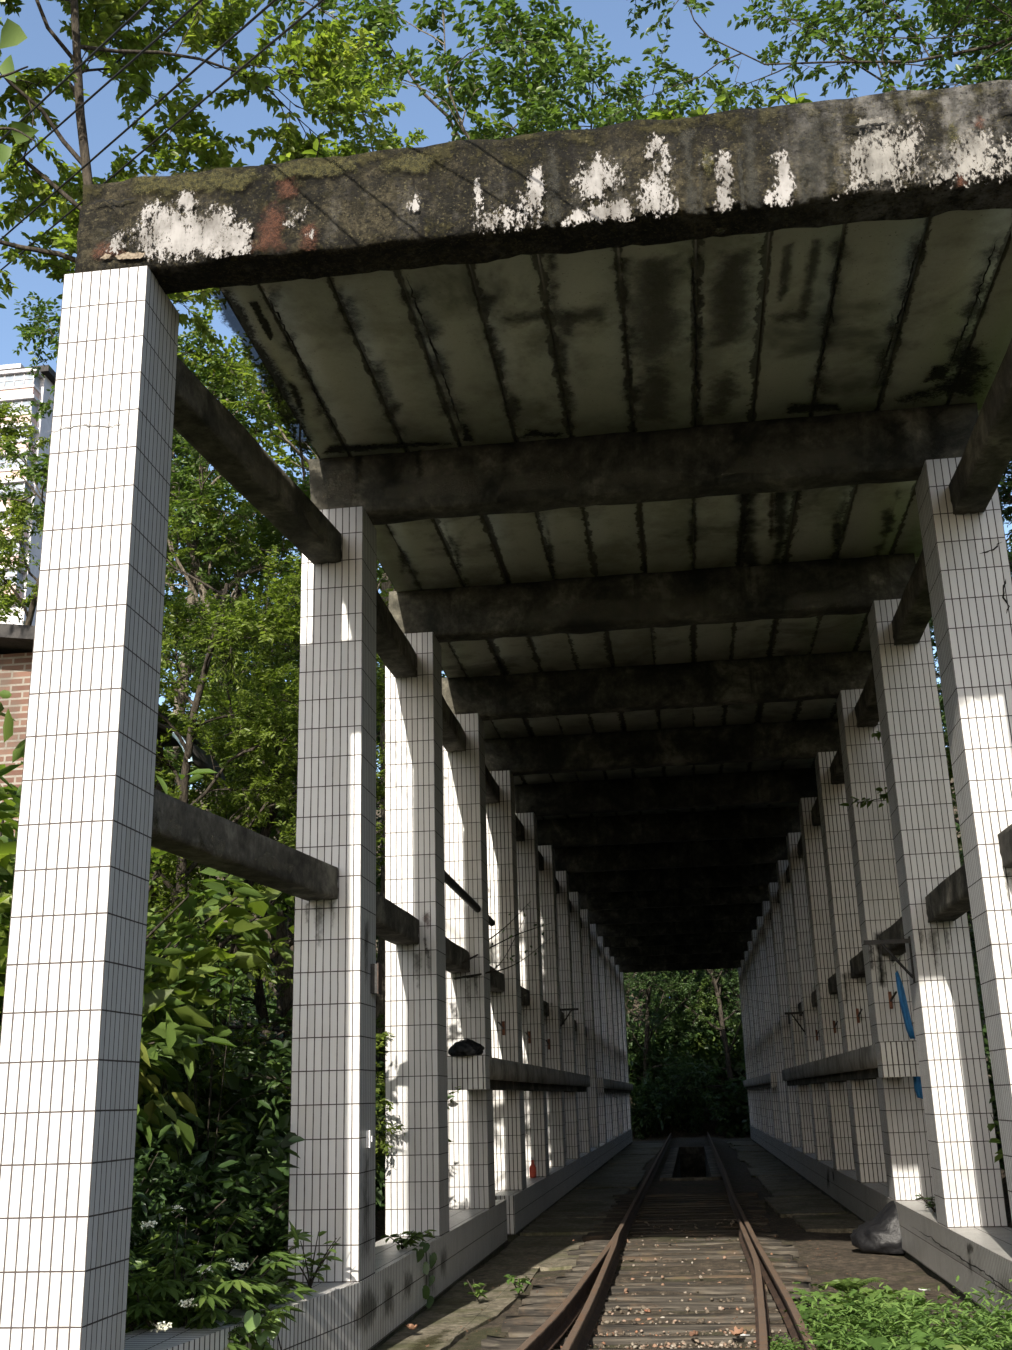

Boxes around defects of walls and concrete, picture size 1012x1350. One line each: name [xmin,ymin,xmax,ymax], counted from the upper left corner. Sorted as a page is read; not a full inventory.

corrosion [256,209,281,248]
corrosion [280,182,295,197]
leakage [206,290,474,498]
leakage [504,254,604,396]
leakage [616,251,752,420]
leakage [357,1278,412,1324]